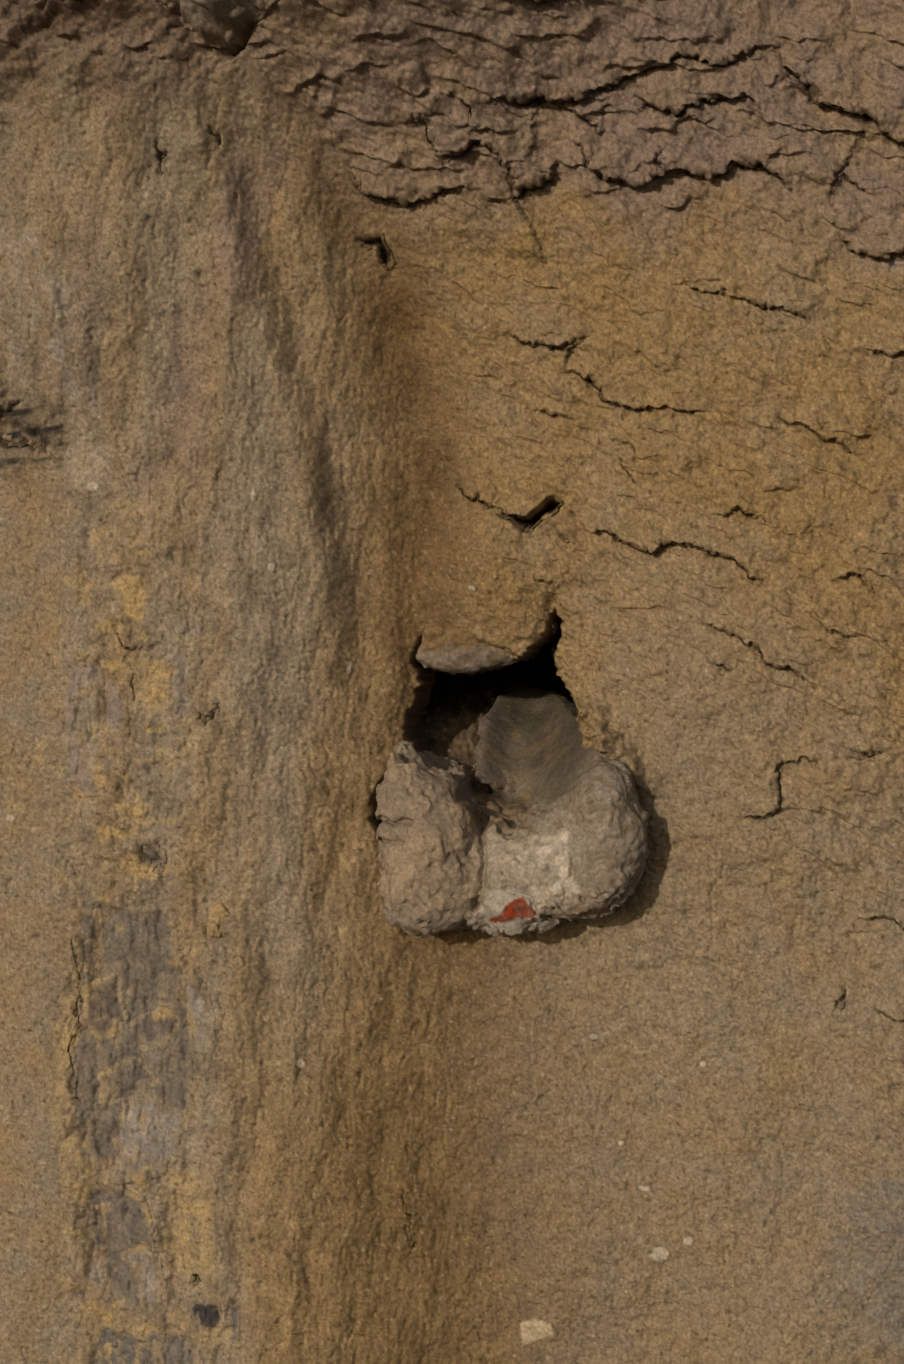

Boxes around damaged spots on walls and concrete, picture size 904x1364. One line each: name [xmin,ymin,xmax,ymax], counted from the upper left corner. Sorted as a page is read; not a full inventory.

crack [347,172,419,208]
crack [830,160,864,196]
crack [745,299,809,320]
crack [501,332,651,486]
crack [777,411,853,455]
crack [455,483,502,515]
crack [722,507,765,524]
crack [605,530,764,586]
crack [696,620,804,681]
spalling [309,114,904,1364]
crack [749,748,889,821]
crack [835,988,904,1022]